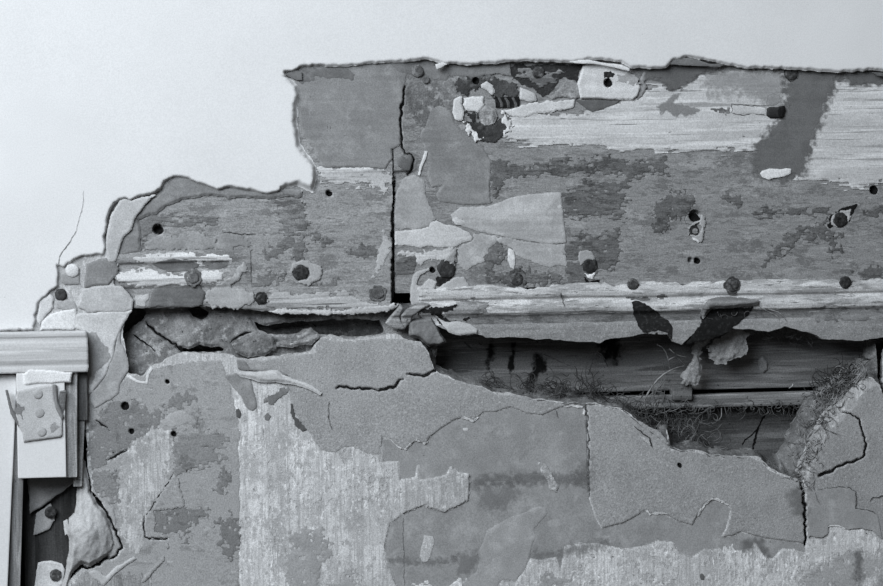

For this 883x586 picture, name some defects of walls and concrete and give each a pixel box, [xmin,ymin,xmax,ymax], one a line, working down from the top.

flaking render [285,67,354,84]
peeling [390,58,790,154]
peeling [760,72,883,191]
flaking render [23,369,72,385]
crack [327,369,437,429]
flaking render [35,151,883,586]
peeling [27,477,73,535]
crack [583,406,591,497]
crack [800,412,883,546]